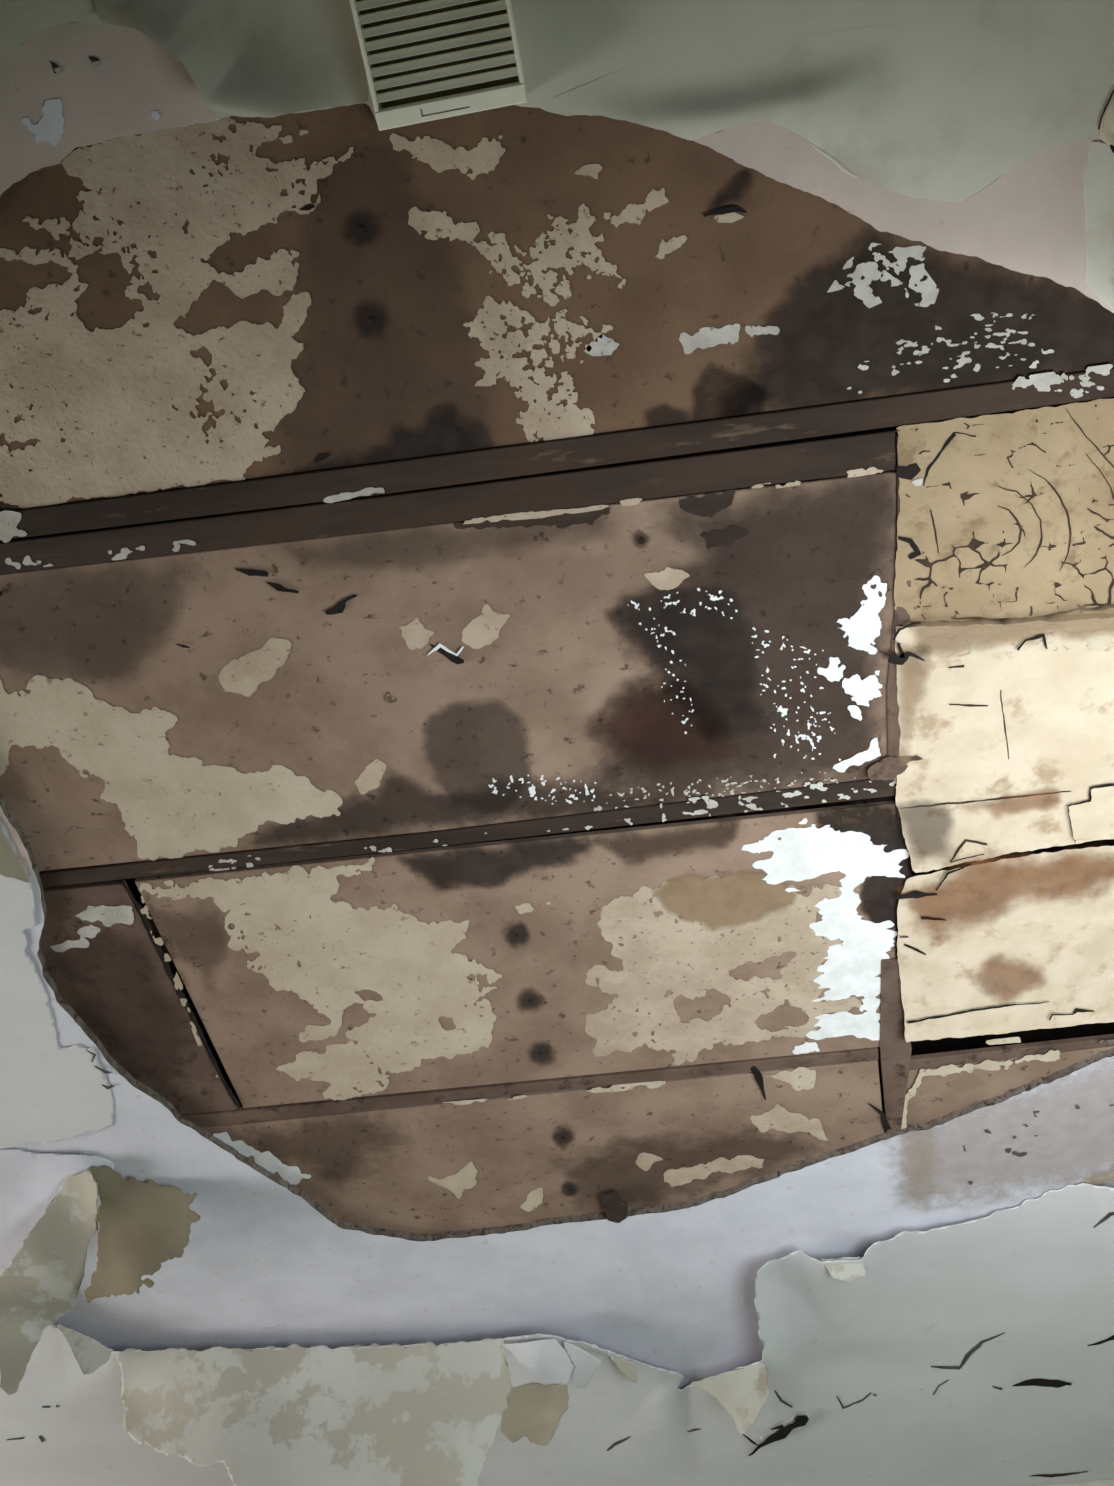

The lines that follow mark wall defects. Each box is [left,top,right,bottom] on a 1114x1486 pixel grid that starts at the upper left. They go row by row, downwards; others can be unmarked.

peeling [471,203,626,367]
damp [648,235,1114,427]
peeling [698,94,1114,313]
peeling [892,313,1054,383]
crack [888,404,1114,668]
damp [209,481,911,929]
peeling [1069,786,1114,841]
crack [897,839,987,955]
damp [902,1063,1114,1196]
peeling [0,1039,1114,1486]
crack [742,1390,877,1456]
crack [992,1379,1072,1390]